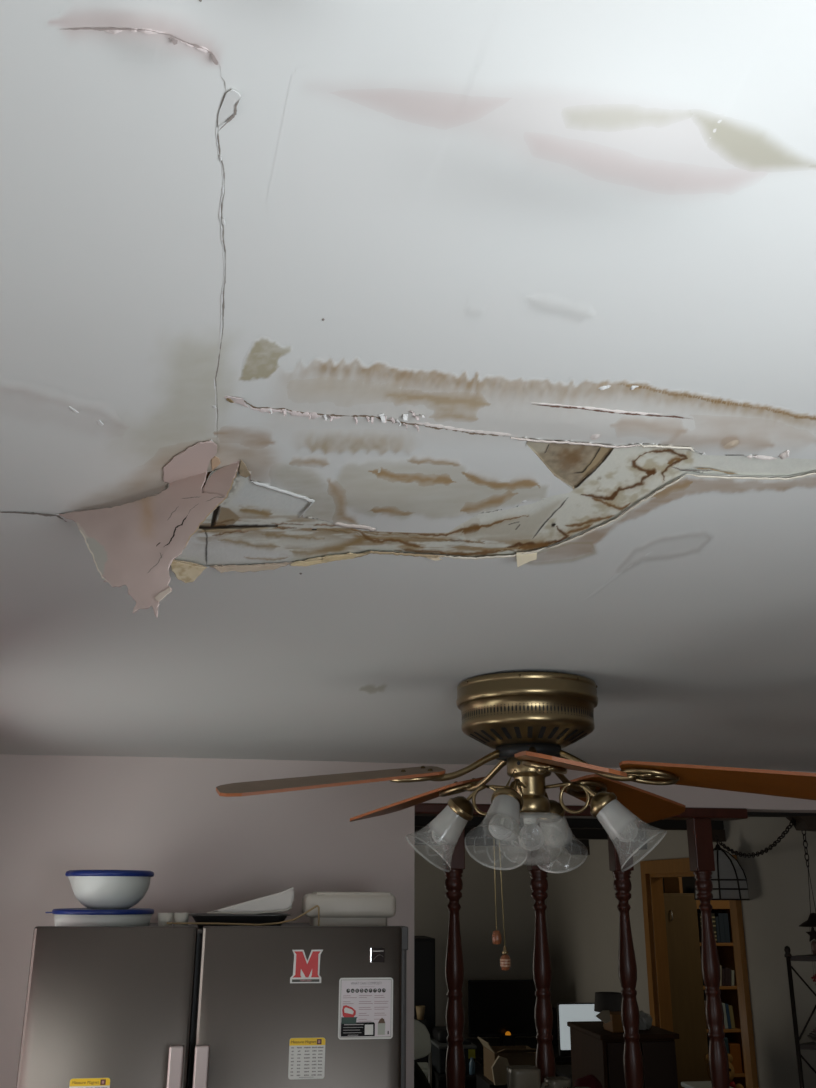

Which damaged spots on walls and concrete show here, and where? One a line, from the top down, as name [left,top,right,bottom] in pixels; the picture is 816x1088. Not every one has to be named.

crack [60,28,516,441]
crack [0,512,73,522]
peeling [59,441,251,618]
water stain [0,319,816,568]
crack [507,443,614,539]
crack [533,403,689,419]
water stain [612,528,717,577]